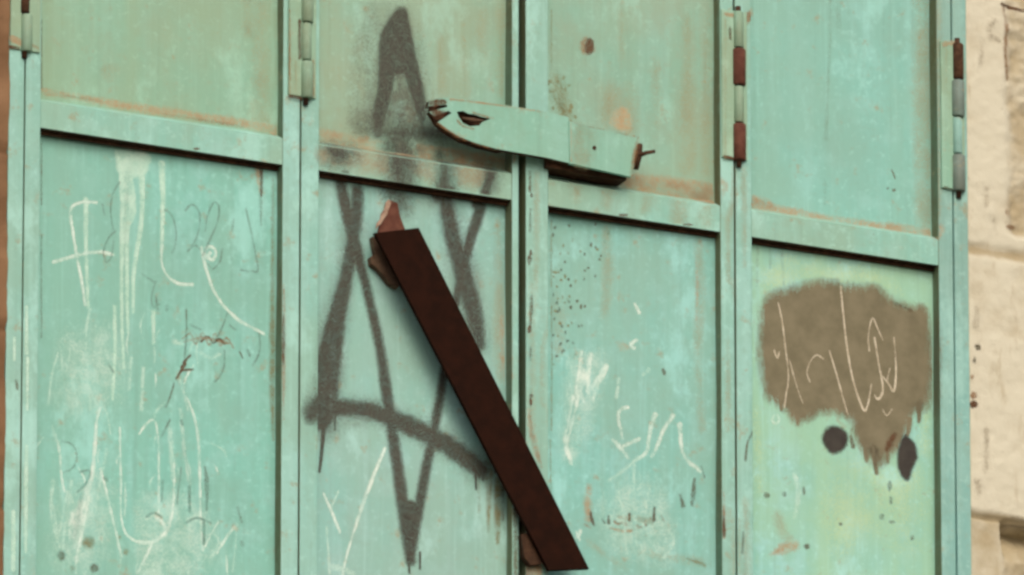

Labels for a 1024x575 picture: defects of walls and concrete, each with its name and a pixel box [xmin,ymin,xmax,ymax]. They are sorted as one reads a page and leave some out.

rust [9,20,285,135]
rust [319,98,536,170]
rust [367,200,616,575]
rust [548,7,944,433]